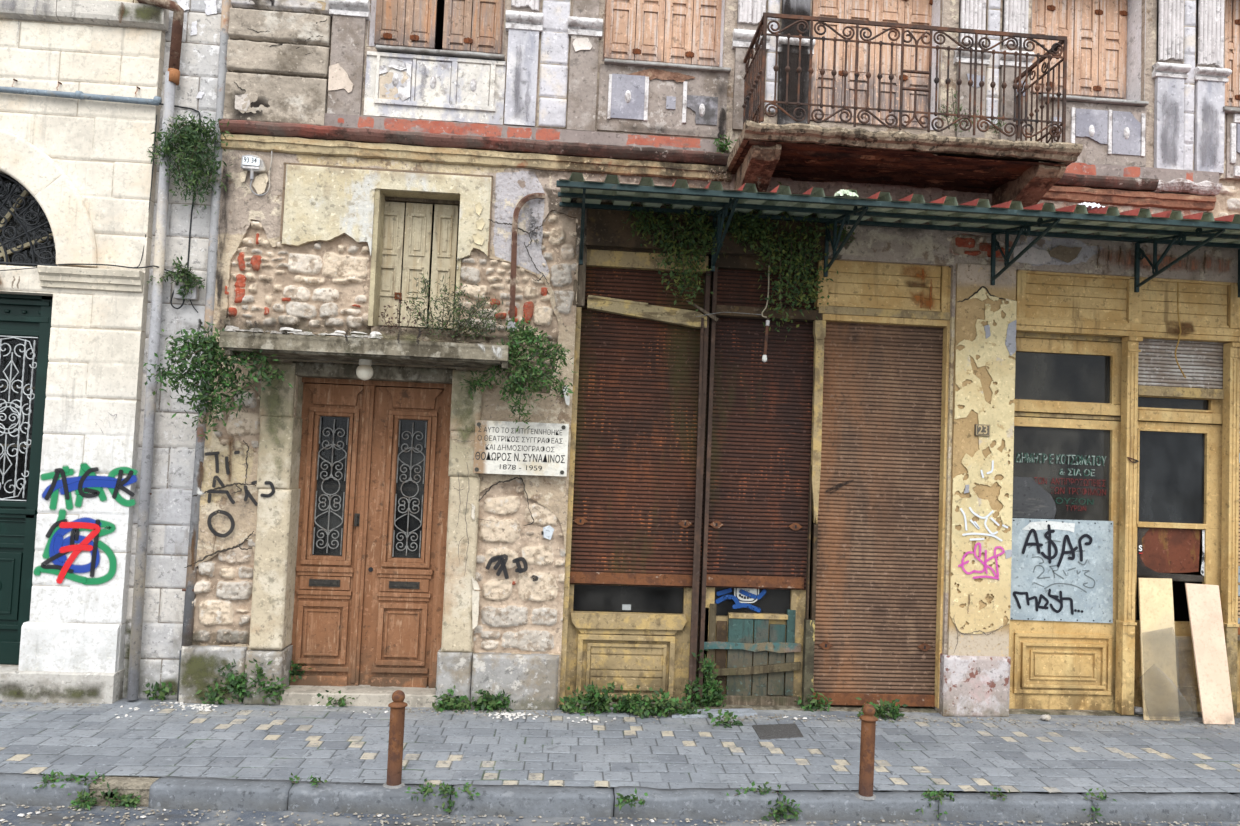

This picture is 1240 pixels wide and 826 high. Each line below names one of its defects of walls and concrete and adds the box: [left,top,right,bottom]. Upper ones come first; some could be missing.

spalling [223,220,374,336]
corrosion [904,268,934,310]
peeling [950,288,1017,634]